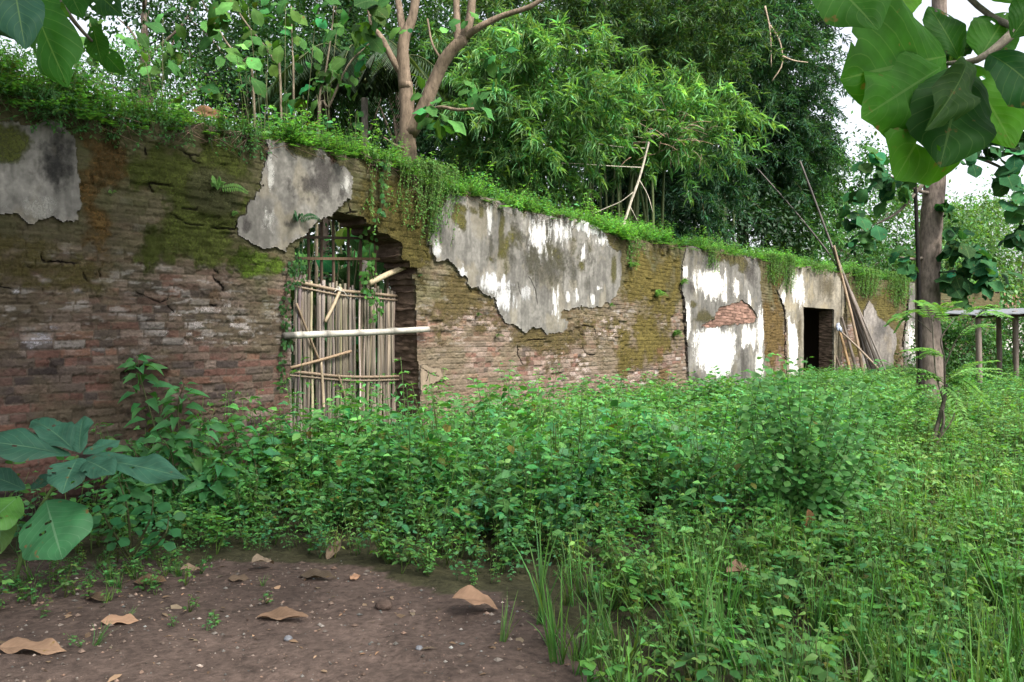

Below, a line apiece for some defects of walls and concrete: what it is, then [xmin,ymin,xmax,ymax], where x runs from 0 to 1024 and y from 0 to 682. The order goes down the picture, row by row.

flaking render [0,120,82,224]
water stain [43,135,73,185]
flaking render [235,139,353,252]
water stain [293,160,349,197]
flaking render [427,189,622,335]
flaking render [680,245,766,393]
flaking render [776,266,846,375]
flaking render [859,282,916,373]